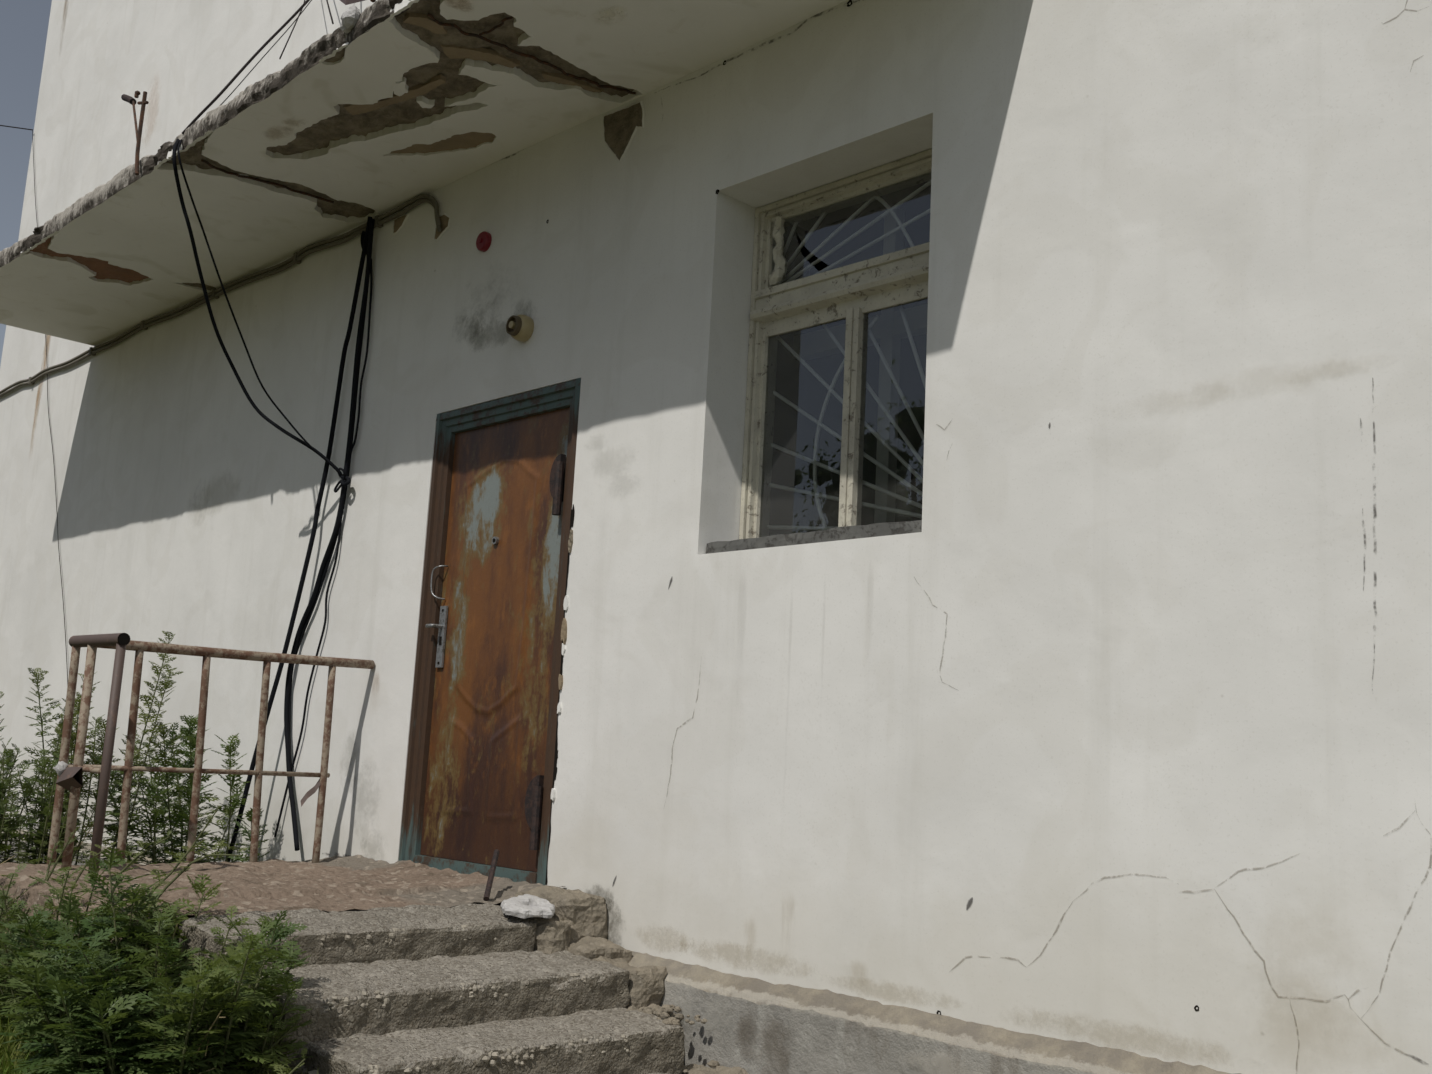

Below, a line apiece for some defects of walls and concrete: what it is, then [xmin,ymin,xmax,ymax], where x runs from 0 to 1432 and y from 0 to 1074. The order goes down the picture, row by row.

spalling [262,0,647,163]
spalling [154,130,409,235]
spalling [20,231,218,292]